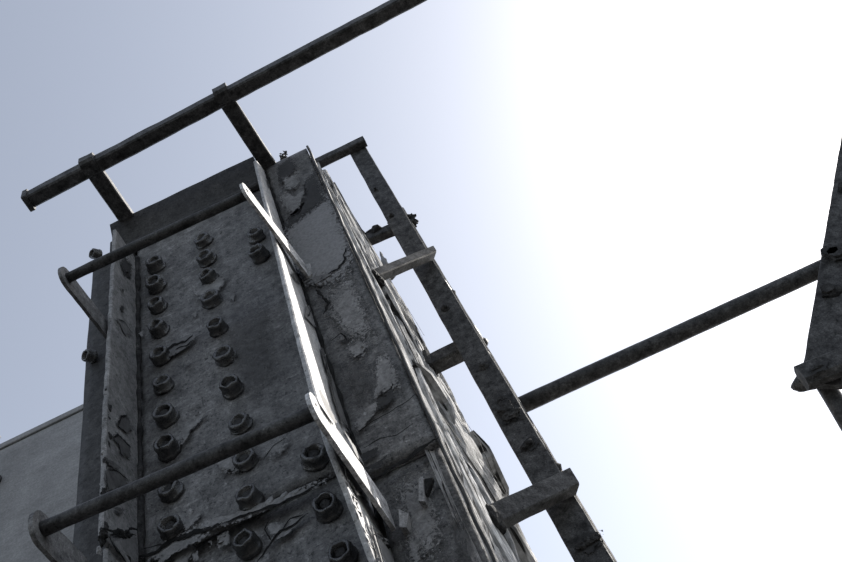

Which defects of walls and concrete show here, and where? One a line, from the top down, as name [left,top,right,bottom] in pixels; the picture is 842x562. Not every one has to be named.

peeling [277,157,401,472]
peeling [100,404,134,495]
peeling [208,529,230,548]
peeling [266,522,282,536]
peeling [169,542,199,562]